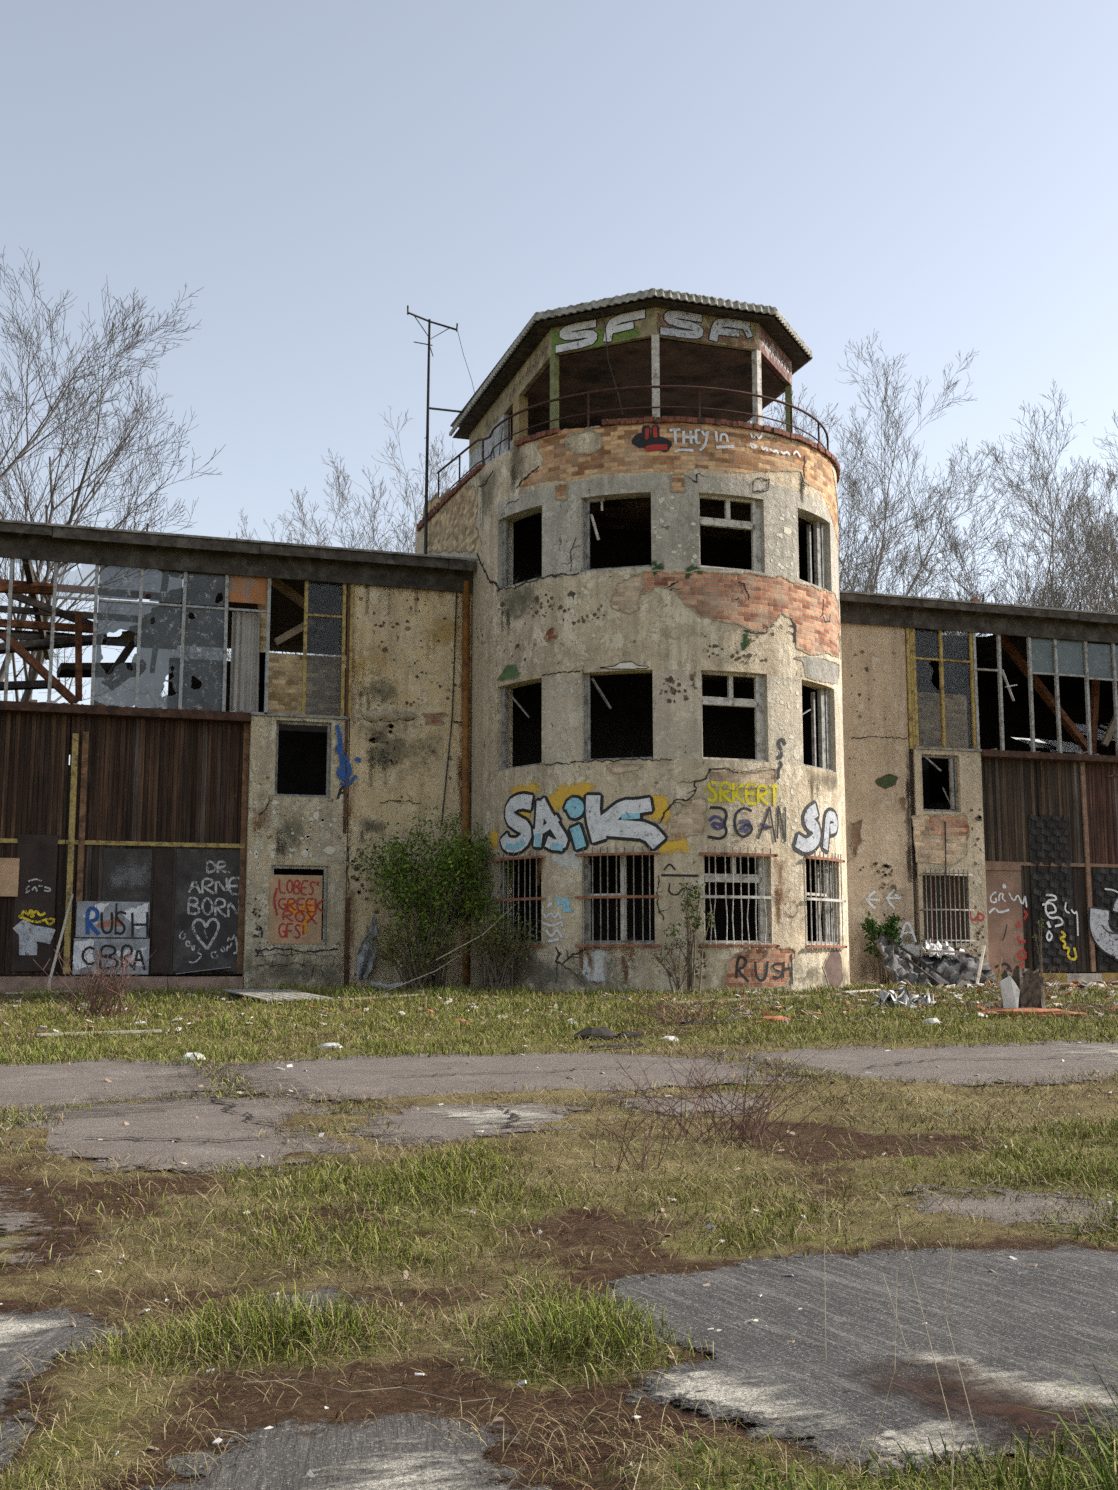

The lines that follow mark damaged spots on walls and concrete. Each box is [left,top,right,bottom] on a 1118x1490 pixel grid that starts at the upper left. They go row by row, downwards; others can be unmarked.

flaking render [498,422,875,718]
peeling [476,614,526,681]
flaking render [664,727,803,847]
flaking render [850,819,900,897]
flaking render [875,774,983,884]
flaking render [952,906,986,959]